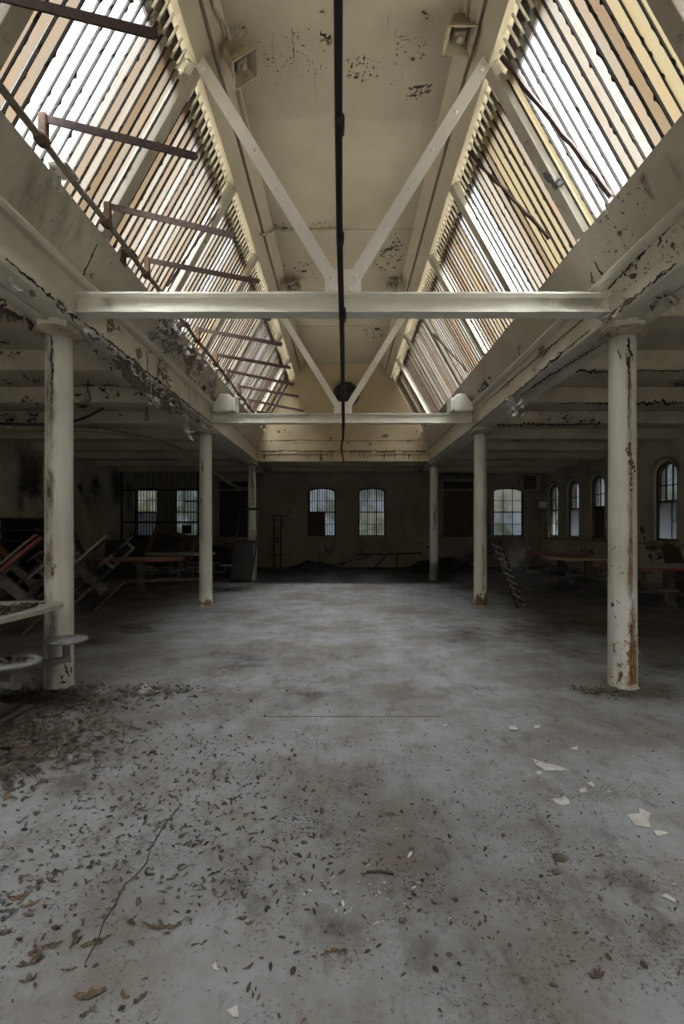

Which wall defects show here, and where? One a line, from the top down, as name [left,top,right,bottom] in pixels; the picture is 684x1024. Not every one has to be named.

peeling [391,80,433,100]
peeling [592,182,647,256]
peeling [598,225,684,327]
peeling [53,296,219,441]
peeling [504,345,594,419]
peeling [625,441,638,491]
spalling [608,600,640,689]
corrosion [628,614,637,686]
crack [84,806,180,964]